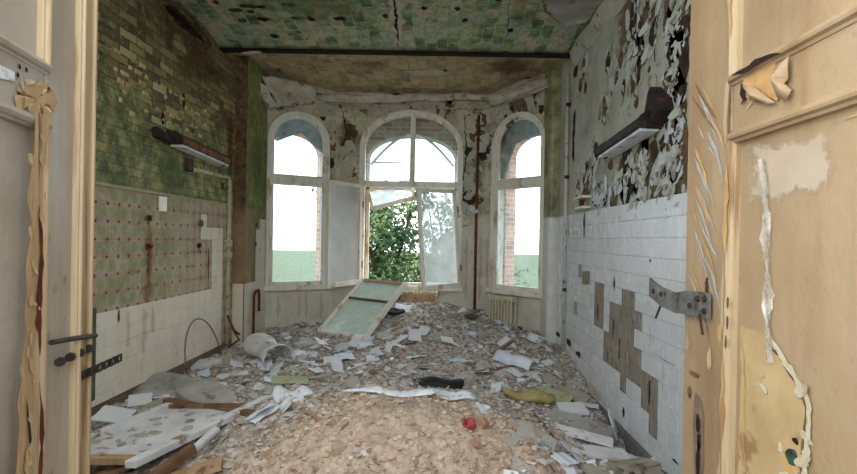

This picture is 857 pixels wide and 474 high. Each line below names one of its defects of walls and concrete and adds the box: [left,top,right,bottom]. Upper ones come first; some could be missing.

crack [388,0,407,46]
peeling [457,92,544,218]
peeling [573,49,591,94]
peeling [576,0,691,219]
peeling [582,271,658,440]
peeling [687,165,729,474]
peeling [738,325,814,474]